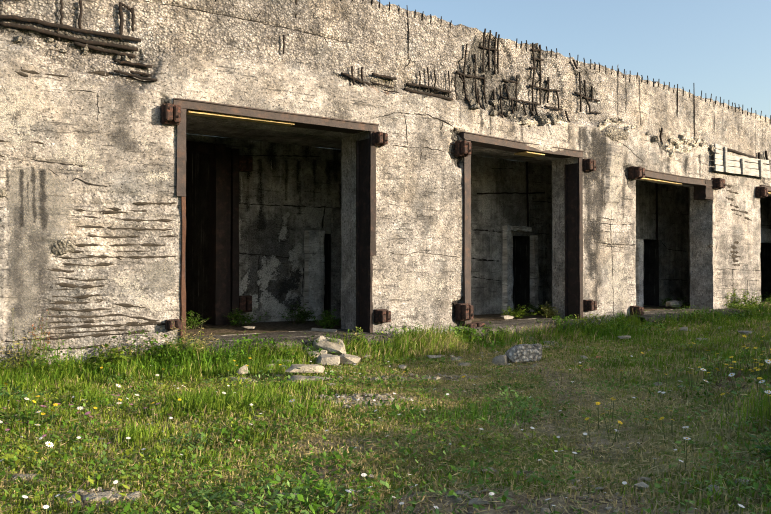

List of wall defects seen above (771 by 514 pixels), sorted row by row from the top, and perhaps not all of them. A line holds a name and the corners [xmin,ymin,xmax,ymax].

spalling [333,28,571,139]
spalling [572,60,636,131]
spalling [450,129,462,168]
spalling [646,127,715,157]
spalling [727,148,771,165]
water stain [9,167,48,330]
peeling [239,240,303,319]